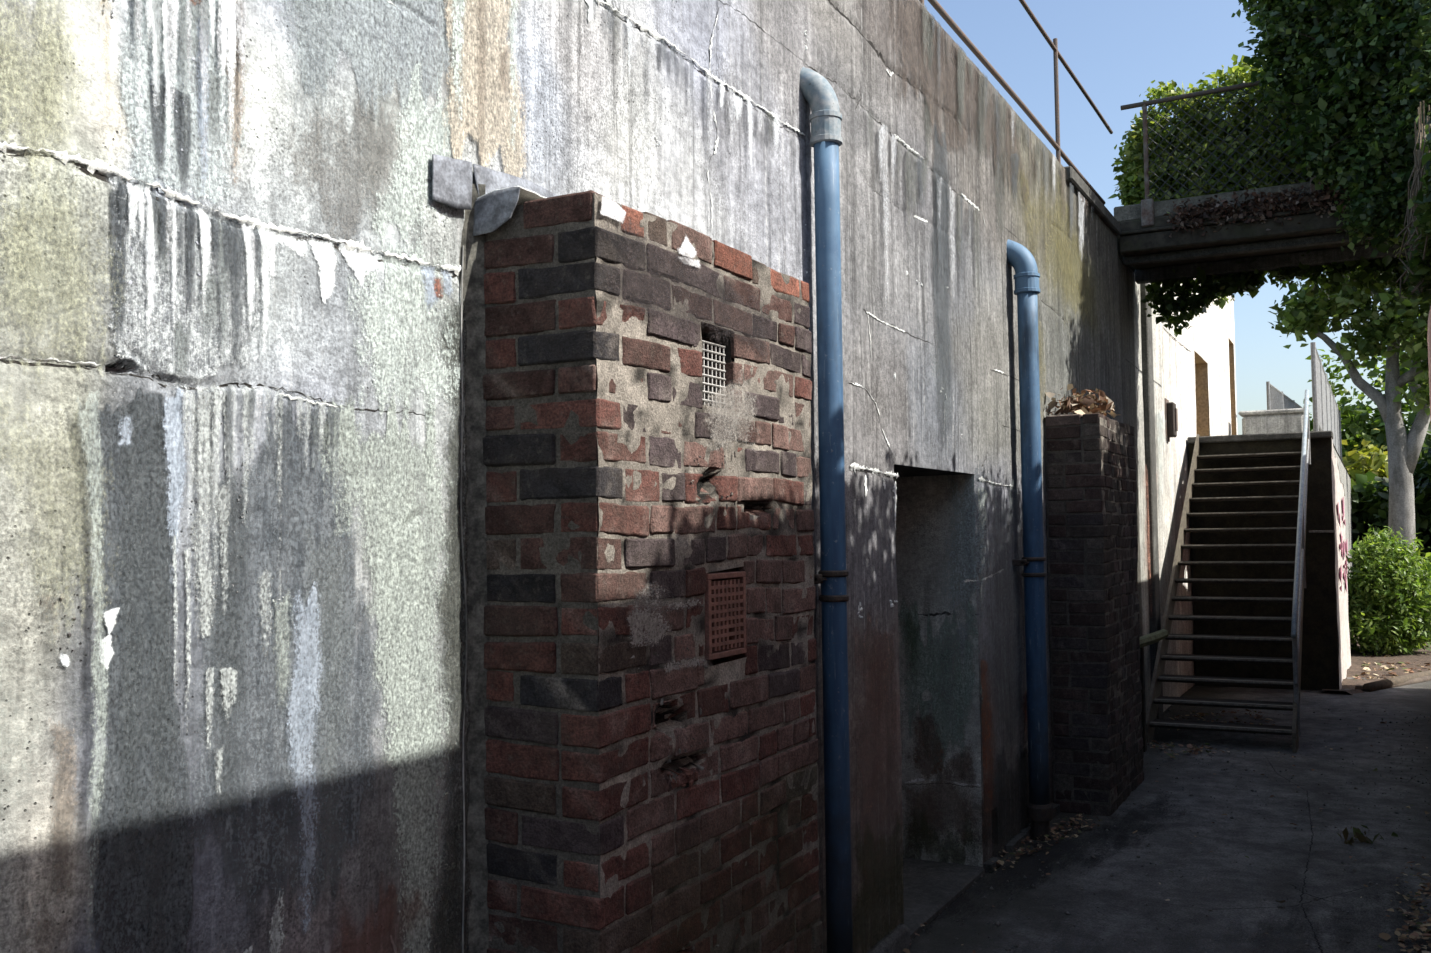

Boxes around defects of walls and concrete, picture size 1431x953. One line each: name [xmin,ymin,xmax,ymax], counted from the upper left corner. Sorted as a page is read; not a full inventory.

crack [0,141,462,290]
damp [79,0,526,953]
spalling [689,452,770,512]
damp [889,469,986,776]
crack [1139,756,1373,953]